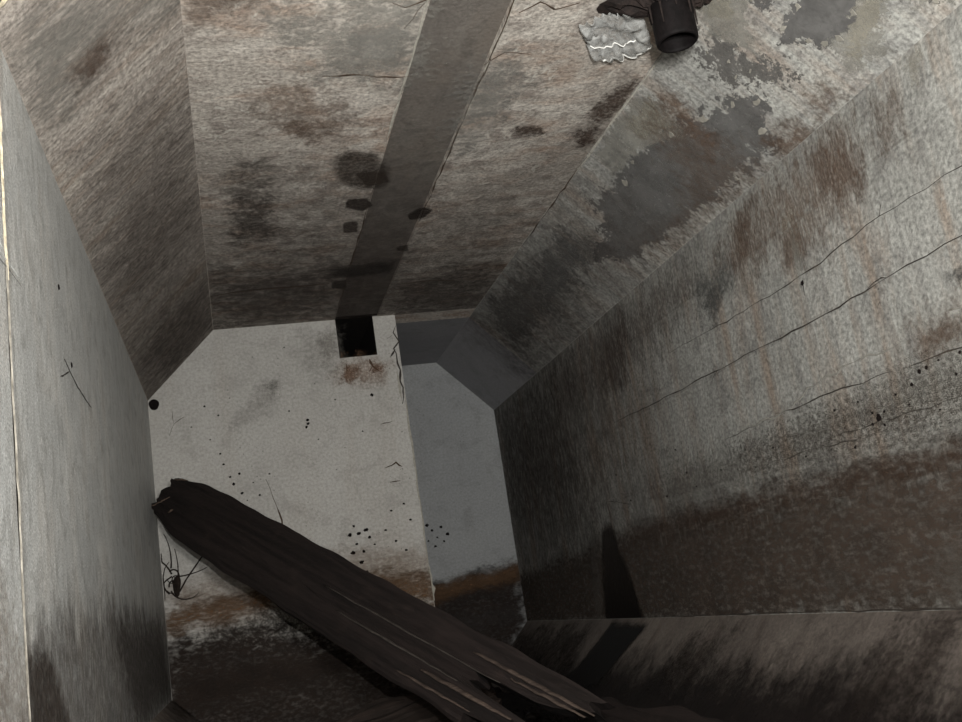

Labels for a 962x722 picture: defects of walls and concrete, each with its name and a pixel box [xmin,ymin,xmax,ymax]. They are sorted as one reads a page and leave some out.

damp [343,222,358,233]
damp [336,152,388,211]
damp [516,126,545,137]
damp [576,80,641,147]
crack [670,165,962,353]
crack [614,235,962,423]
damp [371,438,962,722]
damp [27,590,414,722]